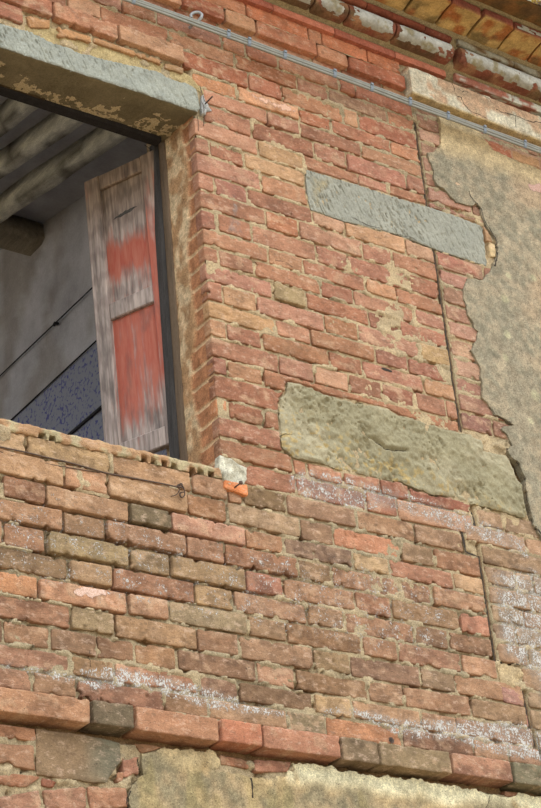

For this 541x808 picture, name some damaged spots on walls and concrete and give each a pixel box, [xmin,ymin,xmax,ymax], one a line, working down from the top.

crack [414,122,429,207]
crack [432,251,462,432]
flaking render [426,109,541,541]
crack [461,509,520,666]
leakage [495,571,541,681]
leakage [24,667,287,717]
leakage [324,707,541,760]
crack [522,691,540,755]